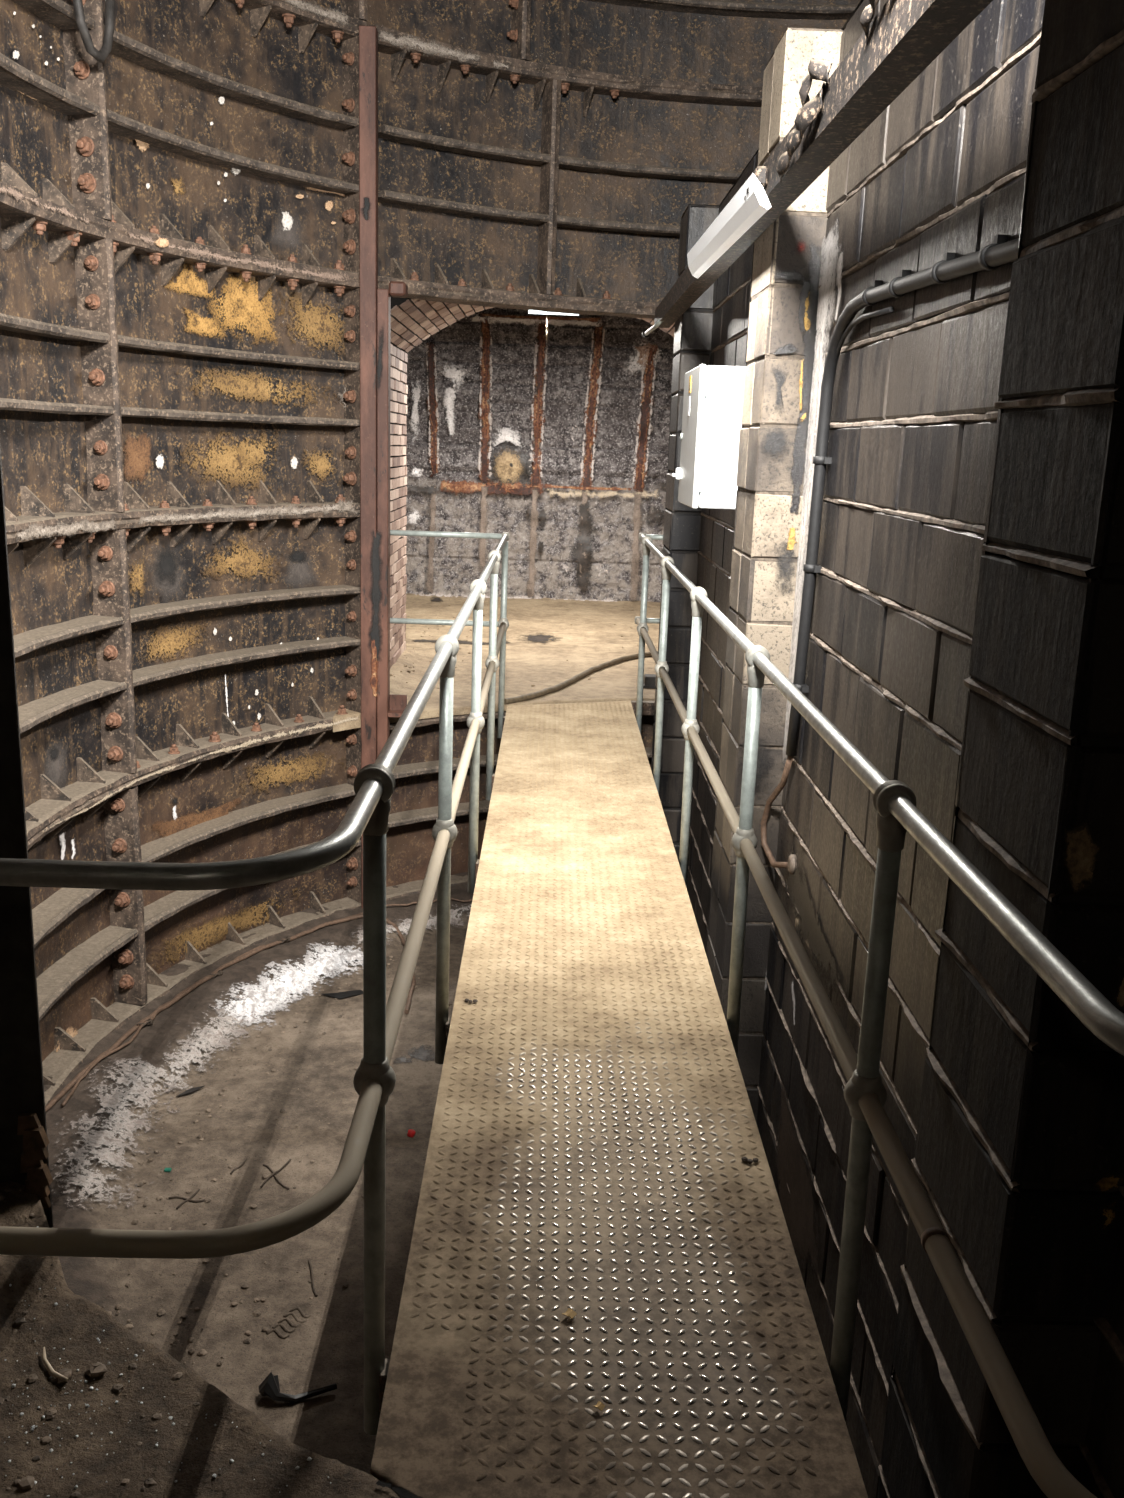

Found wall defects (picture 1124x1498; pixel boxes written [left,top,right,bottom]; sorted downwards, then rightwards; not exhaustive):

rust [362,197,370,220]
water stain [441,362,467,435]
rust [408,314,659,600]
rust [368,532,382,697]